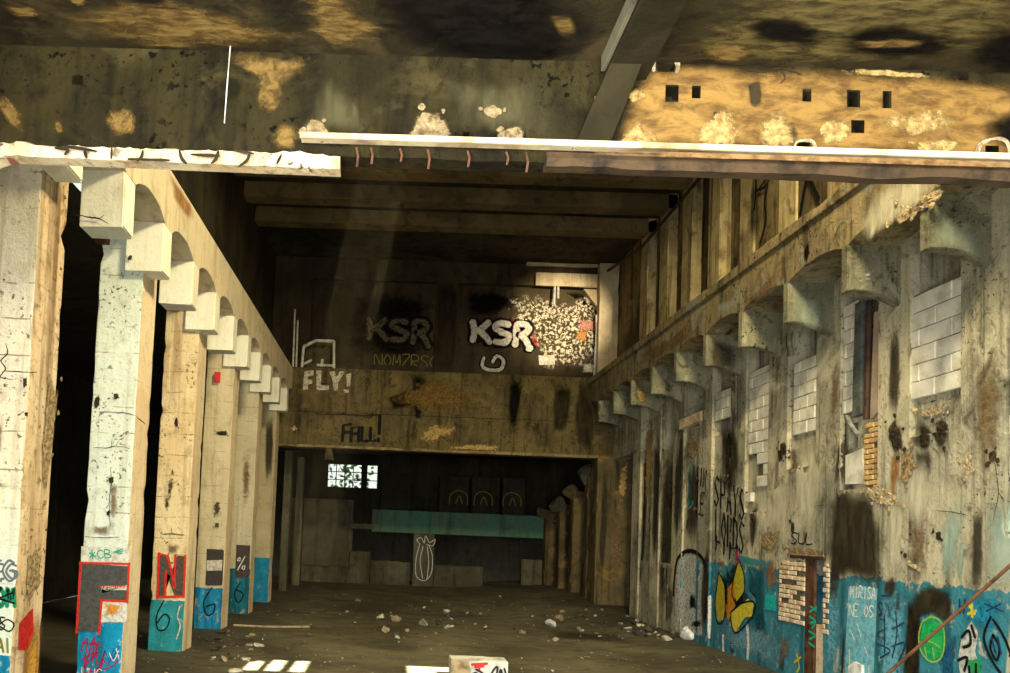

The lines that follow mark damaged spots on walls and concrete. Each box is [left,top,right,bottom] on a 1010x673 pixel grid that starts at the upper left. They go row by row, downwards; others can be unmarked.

peeling [72,2,270,47]
peeling [240,56,303,110]
peeling [621,0,1010,153]
spalling [0,118,341,177]
crack [0,345,37,380]
damp [509,384,521,424]
damp [835,428,848,479]
flaking render [861,413,918,512]
flaking render [759,519,830,635]
damp [830,493,878,604]
damp [890,453,930,574]
damp [885,578,951,673]